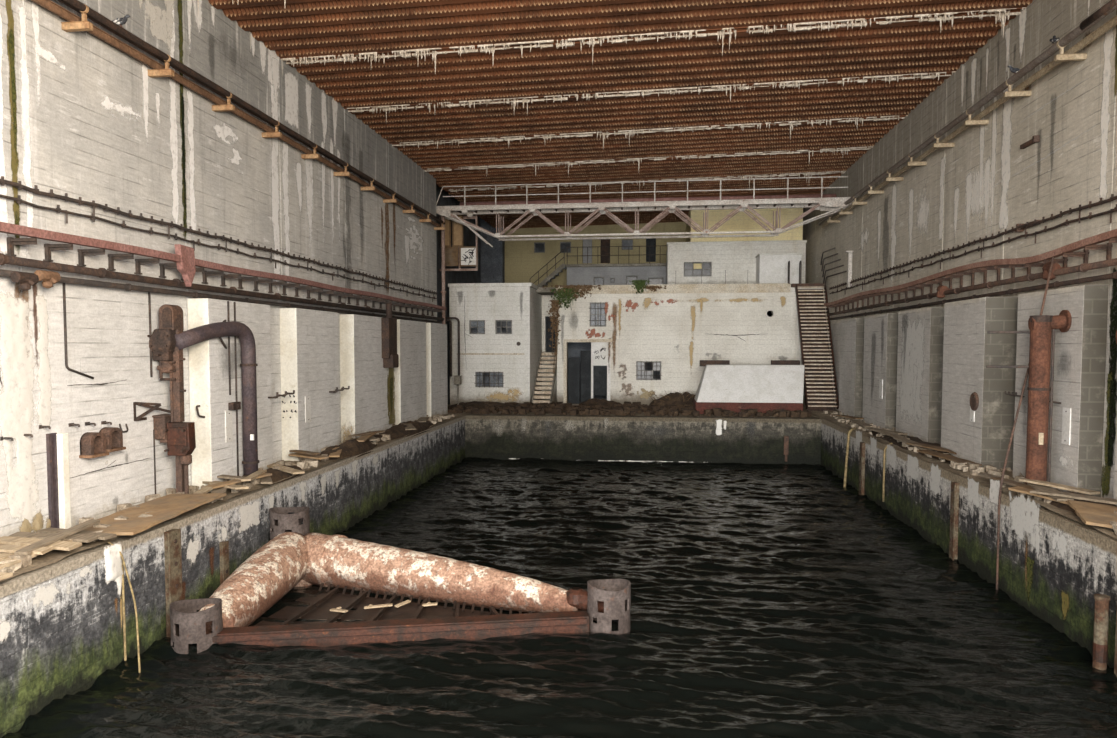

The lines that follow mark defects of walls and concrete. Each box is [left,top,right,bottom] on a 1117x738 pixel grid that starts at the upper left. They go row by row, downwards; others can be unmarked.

leakage [0,9,9,253]
leakage [18,0,40,254]
leakage [1100,28,1117,199]
peeling [0,292,52,532]
leakage [716,419,727,435]
peeling [855,431,941,495]
peeling [968,477,1069,558]